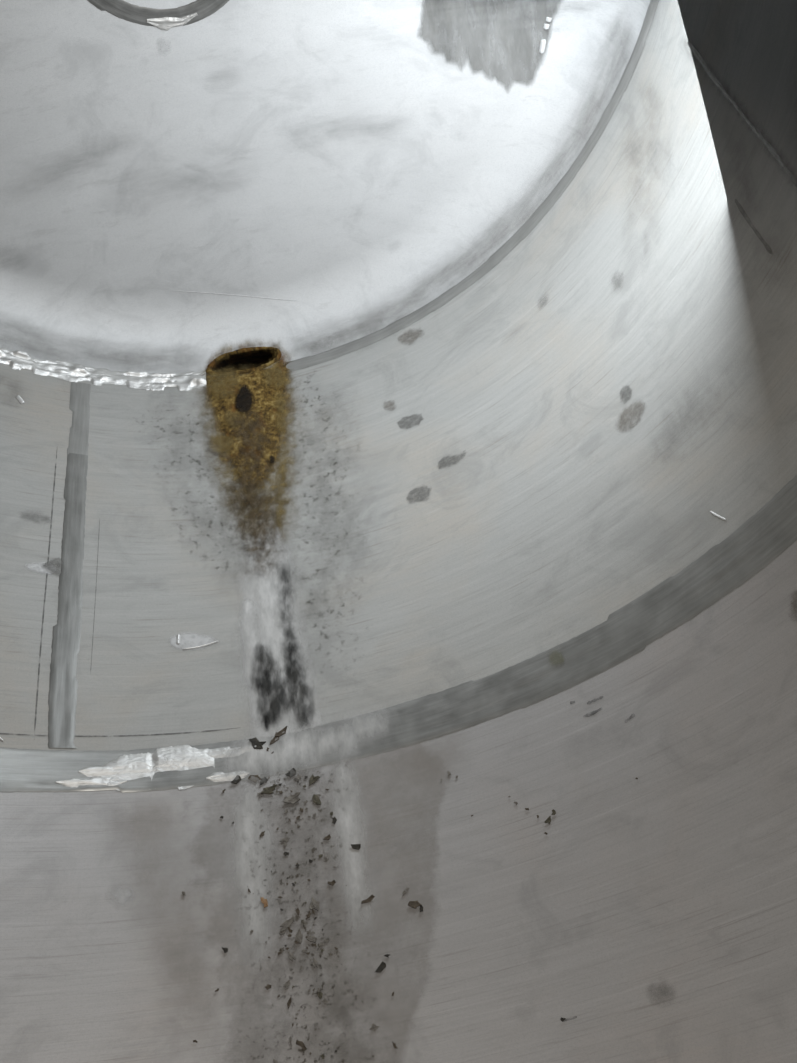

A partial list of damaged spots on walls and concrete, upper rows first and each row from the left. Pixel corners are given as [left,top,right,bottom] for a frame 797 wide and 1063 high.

rust [205,344,295,561]
damp [230,533,383,771]
damp [237,793,266,937]
damp [337,766,366,916]